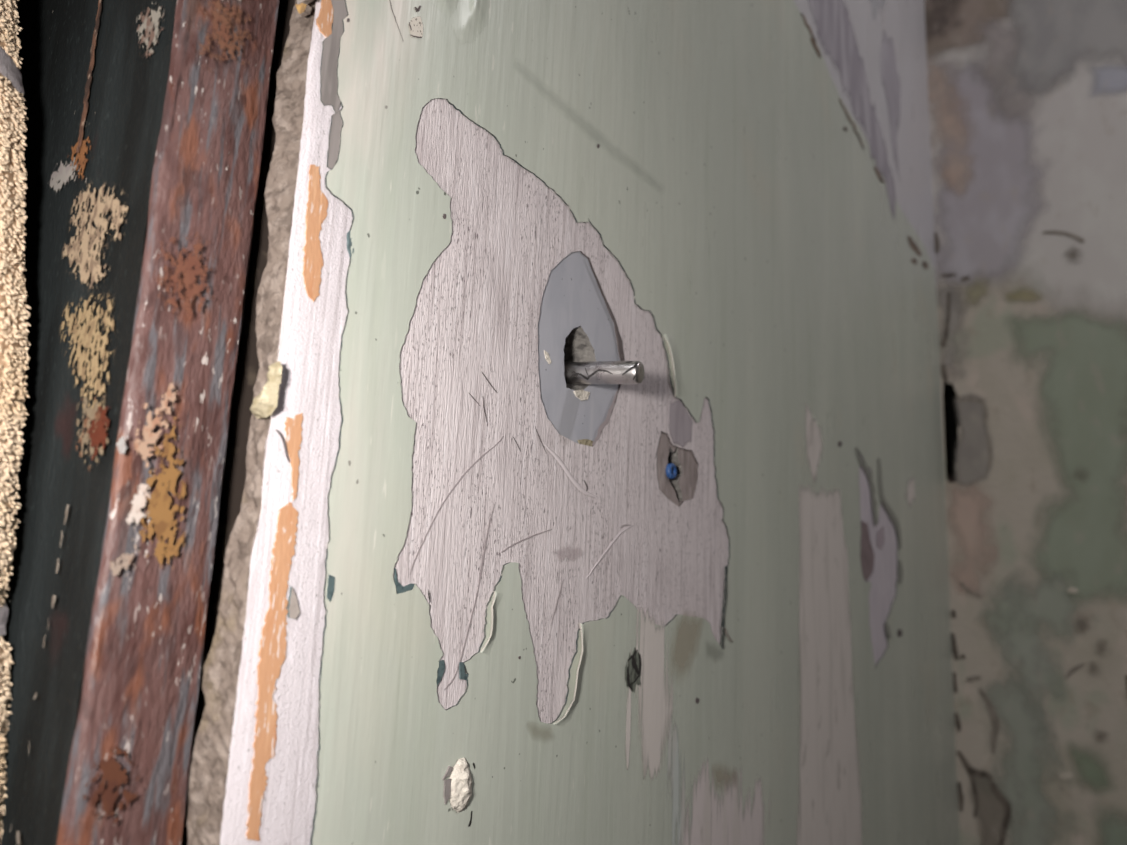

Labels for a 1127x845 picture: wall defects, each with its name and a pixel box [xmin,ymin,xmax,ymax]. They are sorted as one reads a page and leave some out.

corrosion [199,0,251,64]
peeling [409,6,423,38]
peeling [50,158,177,469]
corrosion [154,233,214,318]
peeling [908,236,929,269]
corrosion [85,406,110,461]
flaking render [186,0,353,845]
peeling [393,99,729,726]
peeling [104,484,151,576]
corrosion [134,417,186,568]
peeling [838,441,903,666]
corrosion [83,746,139,824]